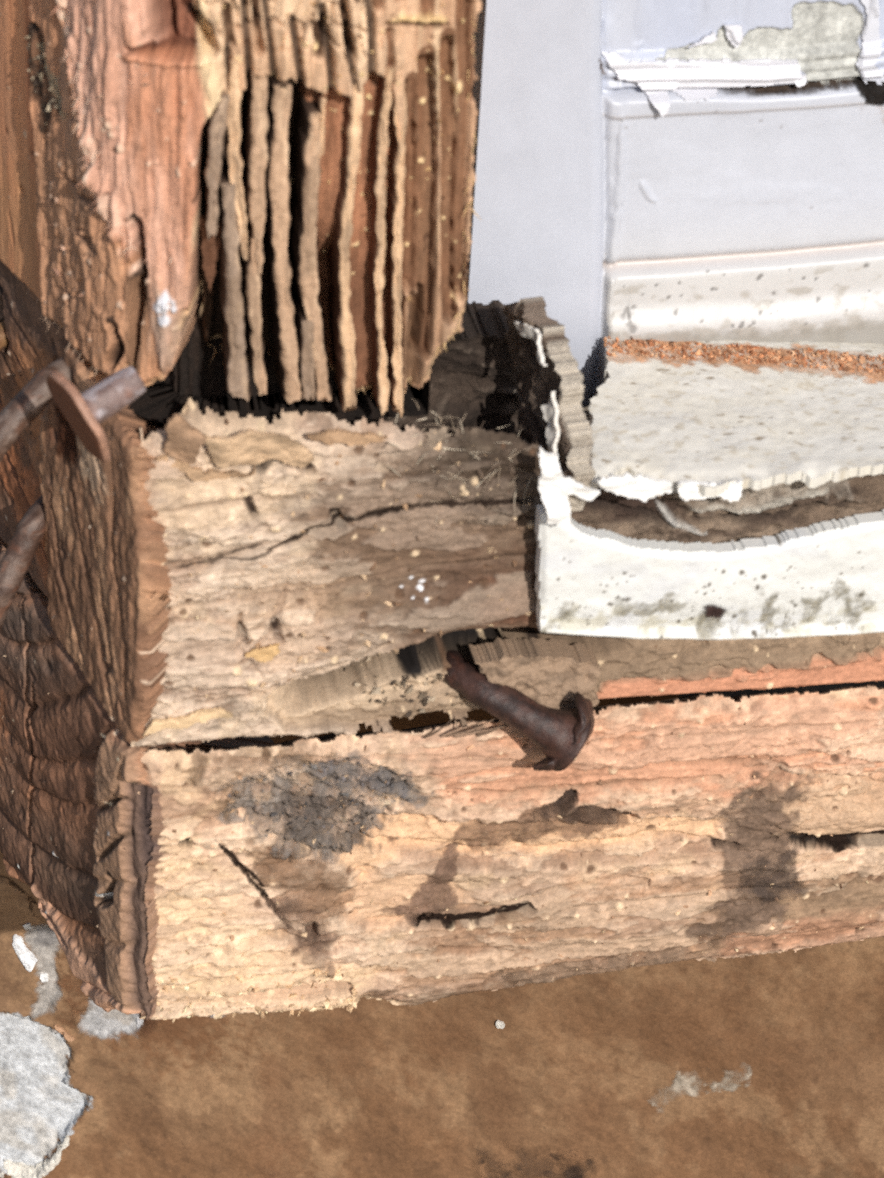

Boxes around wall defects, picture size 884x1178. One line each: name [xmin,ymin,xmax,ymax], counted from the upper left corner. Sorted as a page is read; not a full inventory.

peeling [601,0,884,117]
peeling [514,321,547,367]
rust [55,404,78,463]
peeling [538,391,742,527]
leakage [188,755,208,784]
leakage [219,754,432,955]
crack [418,903,528,929]